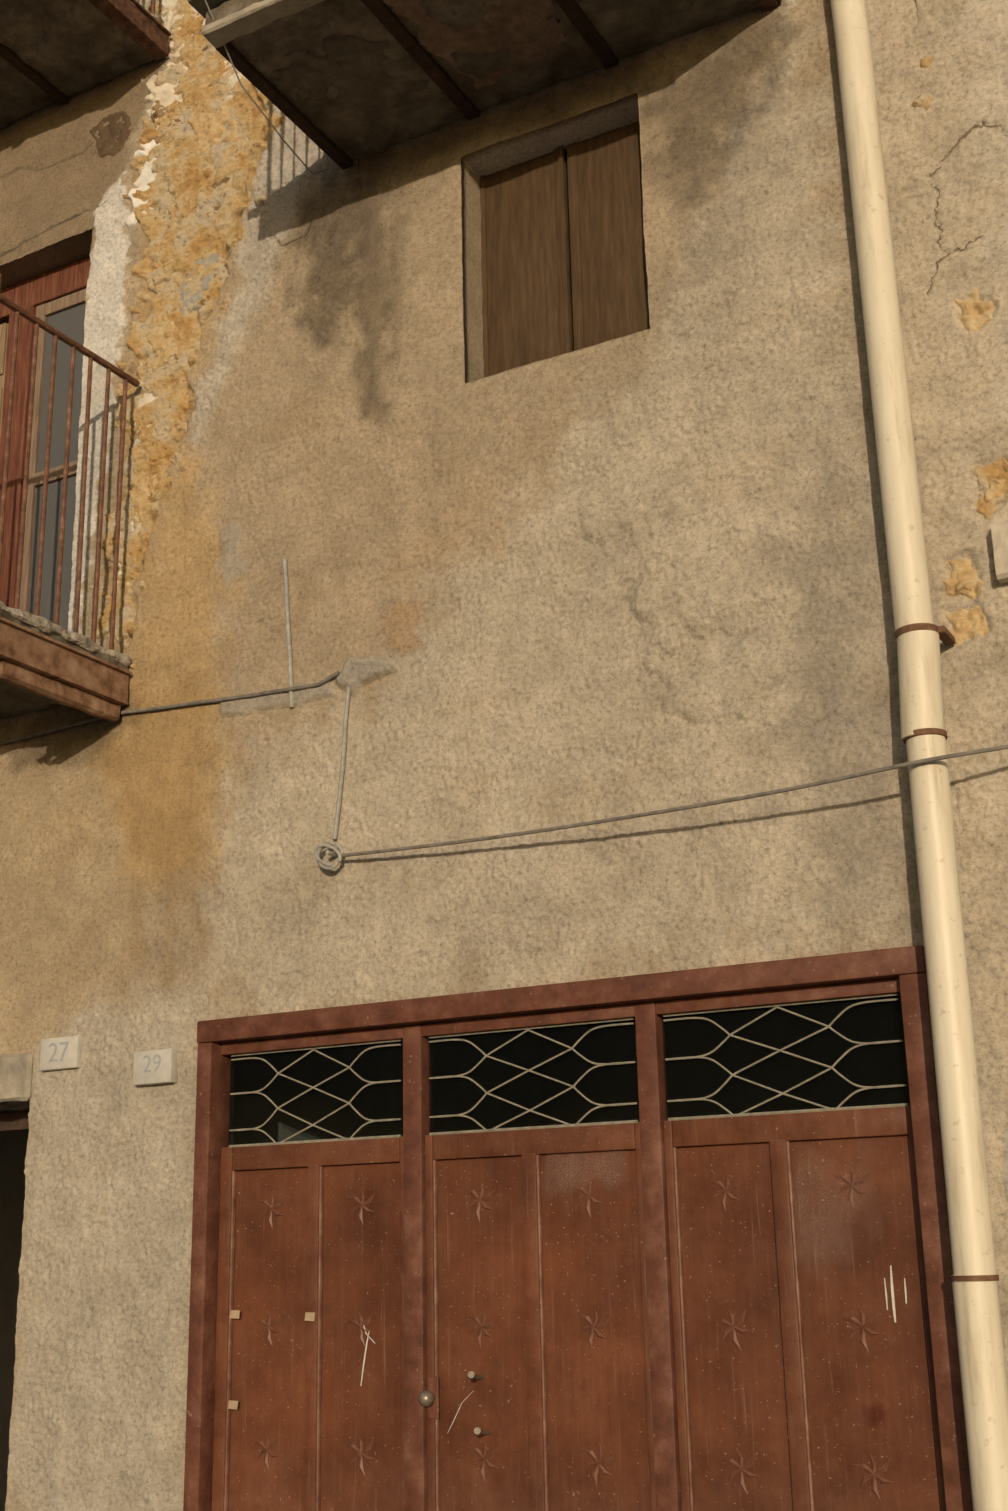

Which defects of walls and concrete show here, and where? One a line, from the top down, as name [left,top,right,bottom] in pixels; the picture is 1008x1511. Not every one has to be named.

crack [926,121,1008,294]
flaking render [89,0,286,670]
spalling [954,288,994,332]
spalling [973,457,1008,519]
spalling [943,557,989,646]